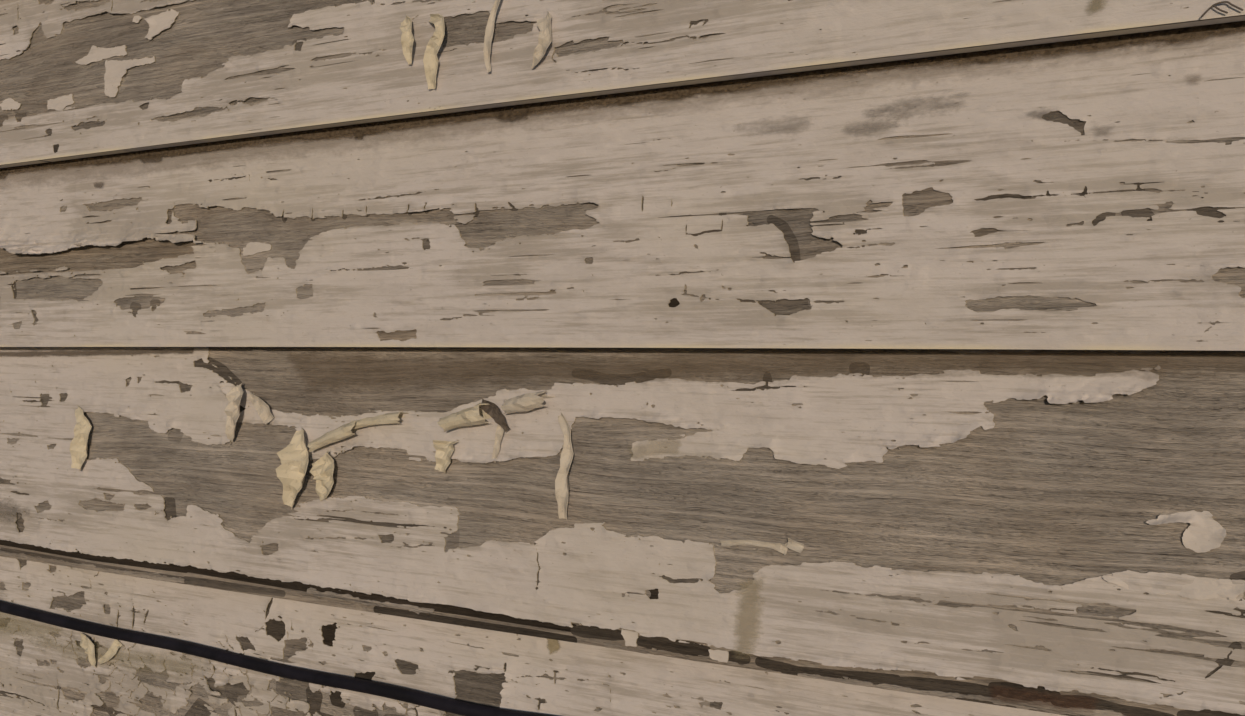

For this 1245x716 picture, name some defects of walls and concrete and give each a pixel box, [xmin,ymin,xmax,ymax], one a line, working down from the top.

peeling [0,0,623,134]
peeling [0,189,600,329]
peeling [743,208,841,263]
peeling [865,187,953,217]
peeling [1092,201,1236,226]
peeling [738,298,844,316]
peeling [964,296,1097,316]
peeling [24,321,1245,618]
peeling [0,633,123,716]
peeling [184,598,419,716]
peeling [446,663,589,716]
peeling [825,590,1242,678]